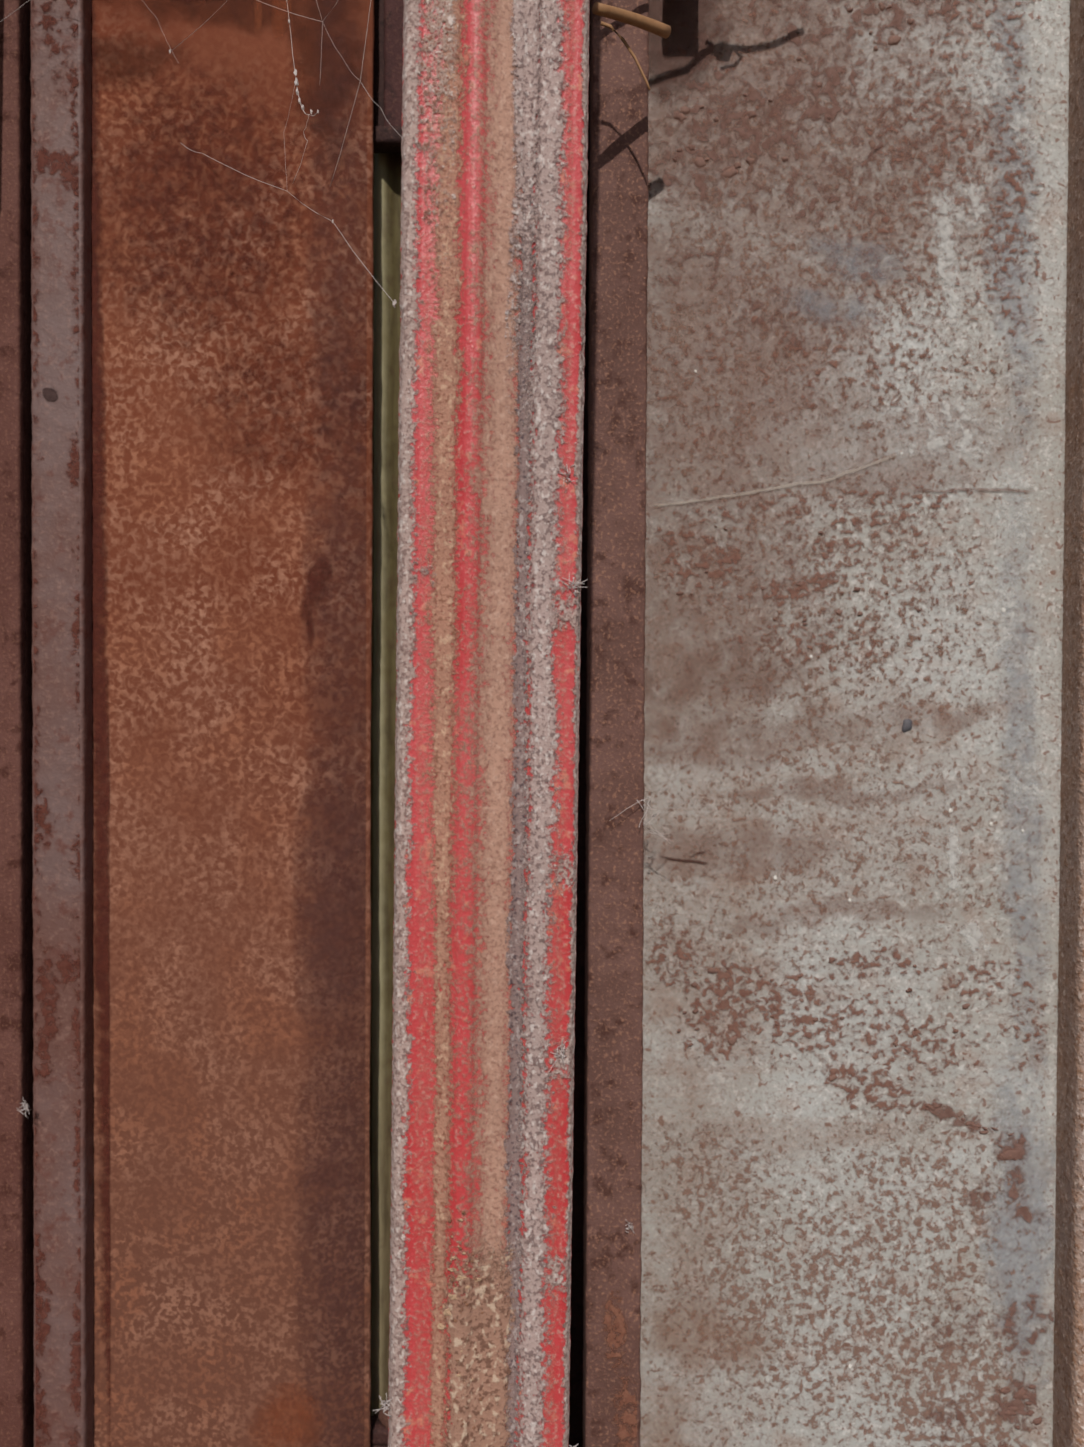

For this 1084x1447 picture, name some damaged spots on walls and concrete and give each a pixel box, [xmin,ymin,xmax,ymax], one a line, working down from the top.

corrosion [150,0,360,132]
corrosion [32,0,79,405]
corrosion [126,124,291,299]
corrosion [66,423,79,488]
corrosion [34,783,51,874]
corrosion [71,594,80,702]
peeling [388,0,459,1447]
peeling [505,0,589,1447]
corrosion [603,0,1056,1447]
corrosion [34,896,80,1218]
corrosion [35,1233,81,1447]